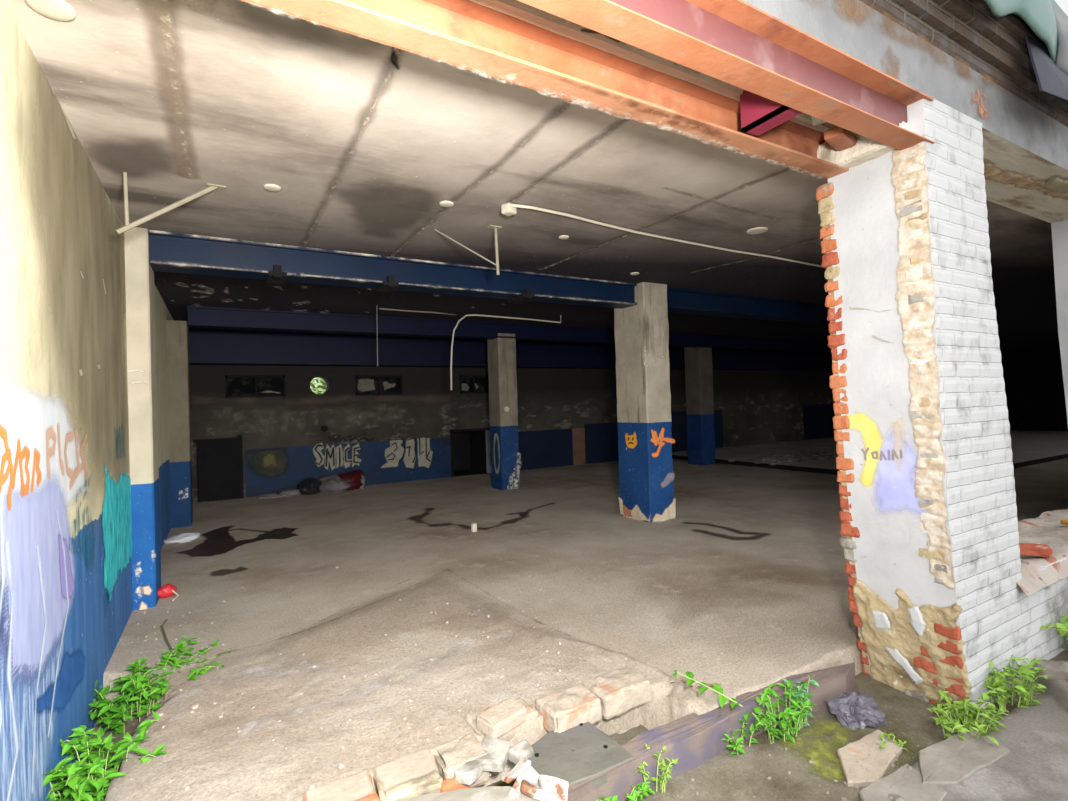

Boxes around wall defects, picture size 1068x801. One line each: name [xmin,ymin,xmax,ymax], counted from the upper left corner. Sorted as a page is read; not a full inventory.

peeling [540,89,626,118]
rust [630,102,720,135]
flaking render [984,163,1068,200]
flaking render [645,122,973,710]
flaking render [618,497,676,522]